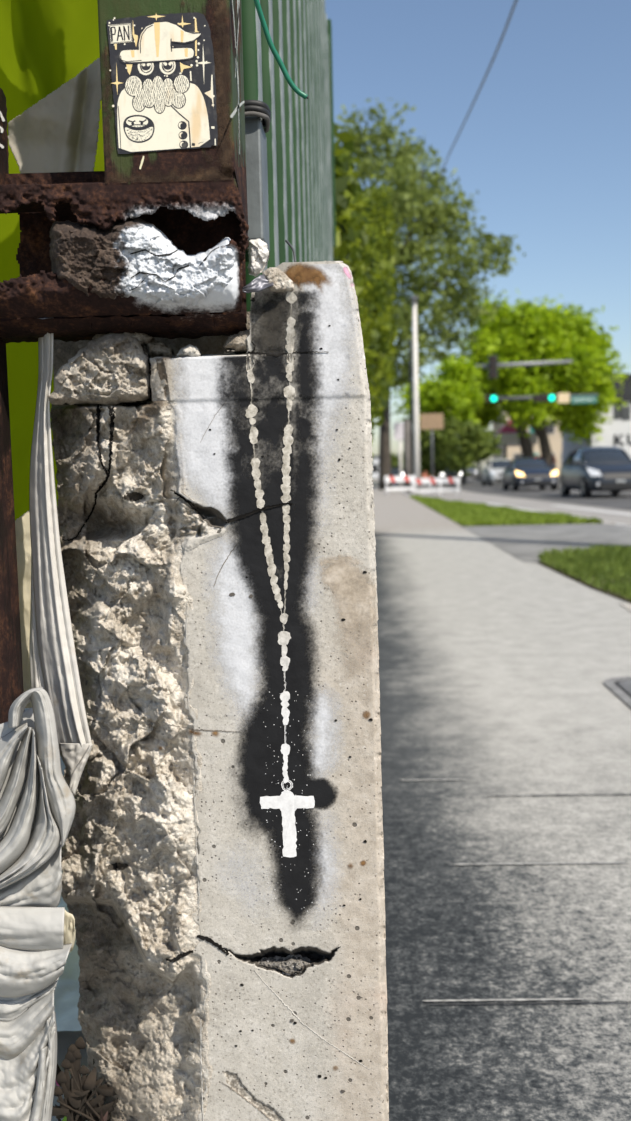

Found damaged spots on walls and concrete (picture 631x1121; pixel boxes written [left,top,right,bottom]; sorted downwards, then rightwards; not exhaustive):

rust [109,0,233,183]
rust [285,264,327,288]
crack [62,356,152,541]
crack [170,490,198,510]
crack [214,503,292,586]
spalling [50,401,284,1121]
crack [166,935,341,978]